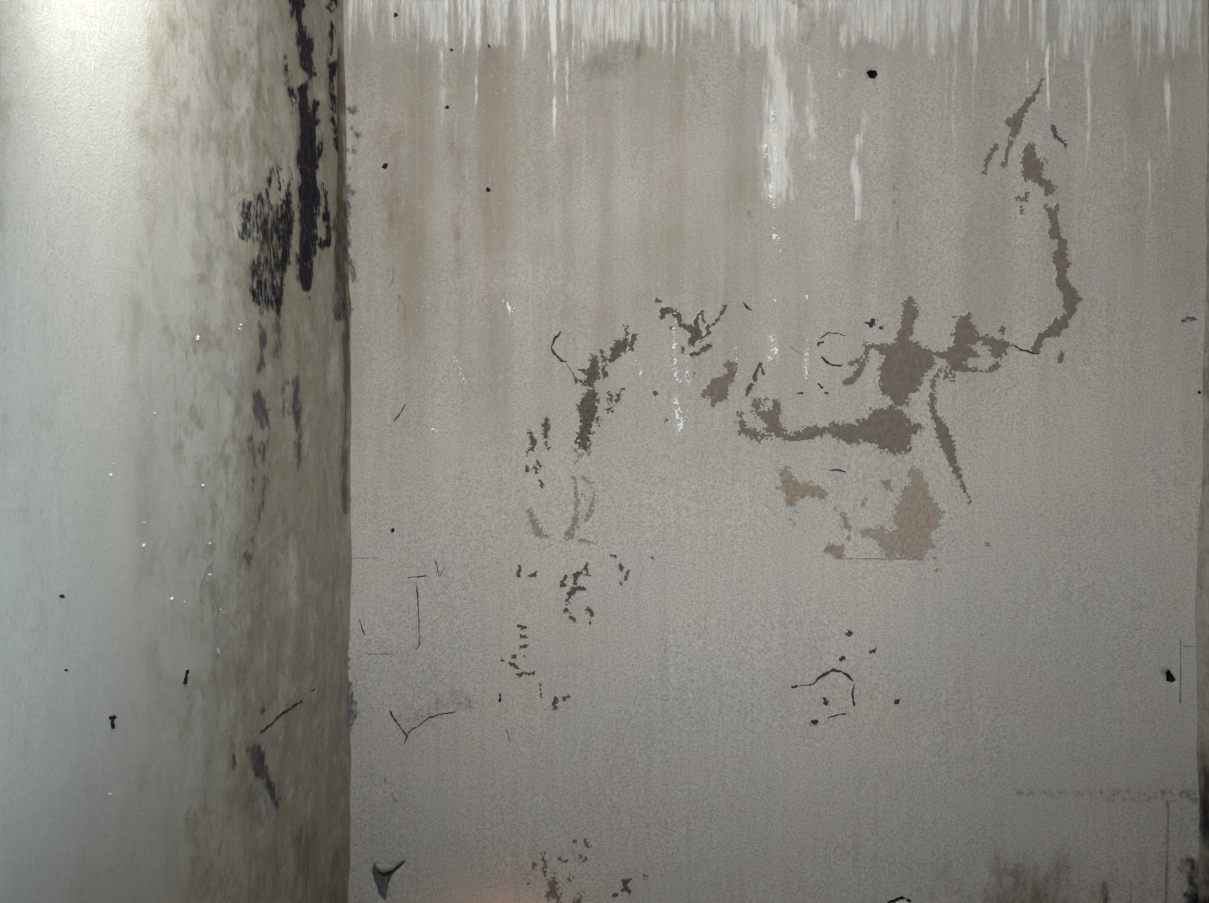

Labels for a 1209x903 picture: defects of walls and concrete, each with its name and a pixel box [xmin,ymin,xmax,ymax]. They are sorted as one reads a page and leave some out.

leakage [238,0,1202,385]
leakage [229,375,301,575]
peeling [524,324,638,545]
peeling [655,298,727,377]
peeling [699,75,1084,572]
leakage [1185,859,1206,903]
leakage [1199,769,1209,845]